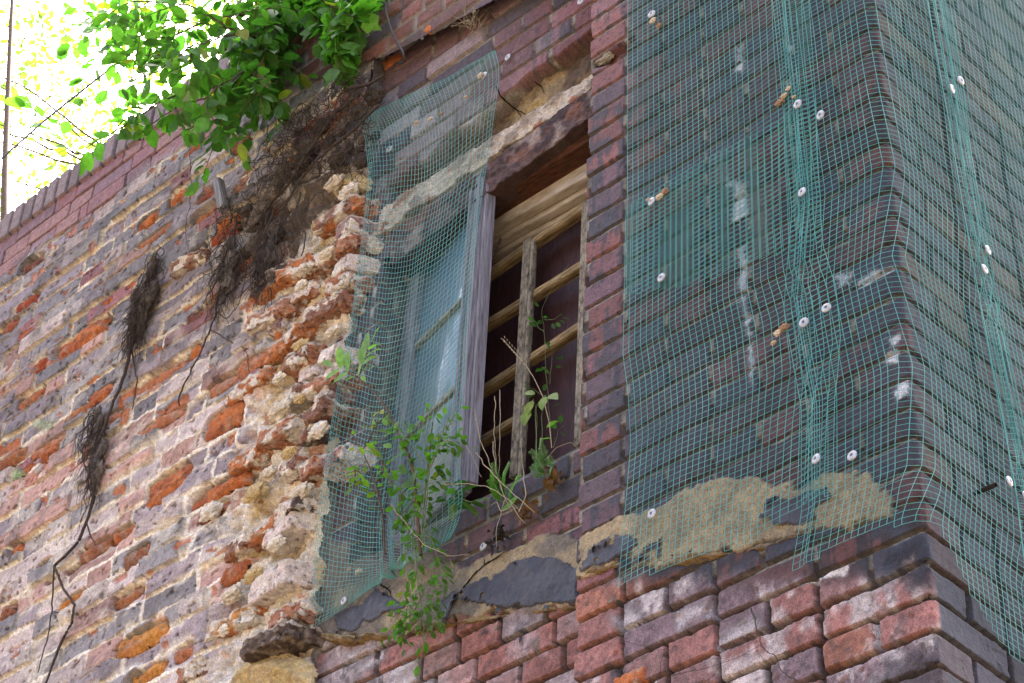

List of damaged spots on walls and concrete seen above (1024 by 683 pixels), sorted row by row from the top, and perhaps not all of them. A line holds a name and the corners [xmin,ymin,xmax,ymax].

crack [495,85,526,116]
spalling [431,54,592,176]
spalling [132,191,409,683]
peeling [759,487,831,526]
crack [452,550,509,606]
peeling [432,534,674,622]